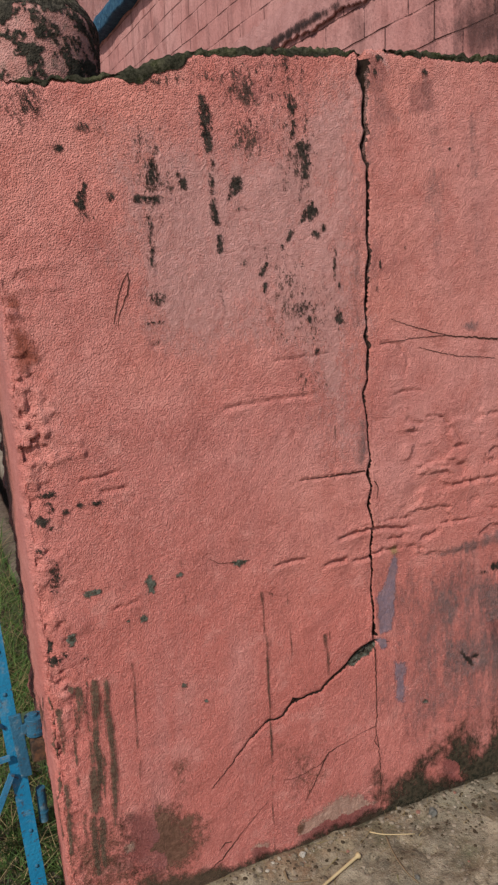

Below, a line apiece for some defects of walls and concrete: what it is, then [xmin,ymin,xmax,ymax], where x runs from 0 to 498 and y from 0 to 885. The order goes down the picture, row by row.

leakage [0,0,101,137]
leakage [73,175,95,222]
leakage [123,115,188,271]
leakage [142,55,345,355]
crack [212,58,498,814]
leakage [260,592,273,708]
leakage [42,679,498,885]